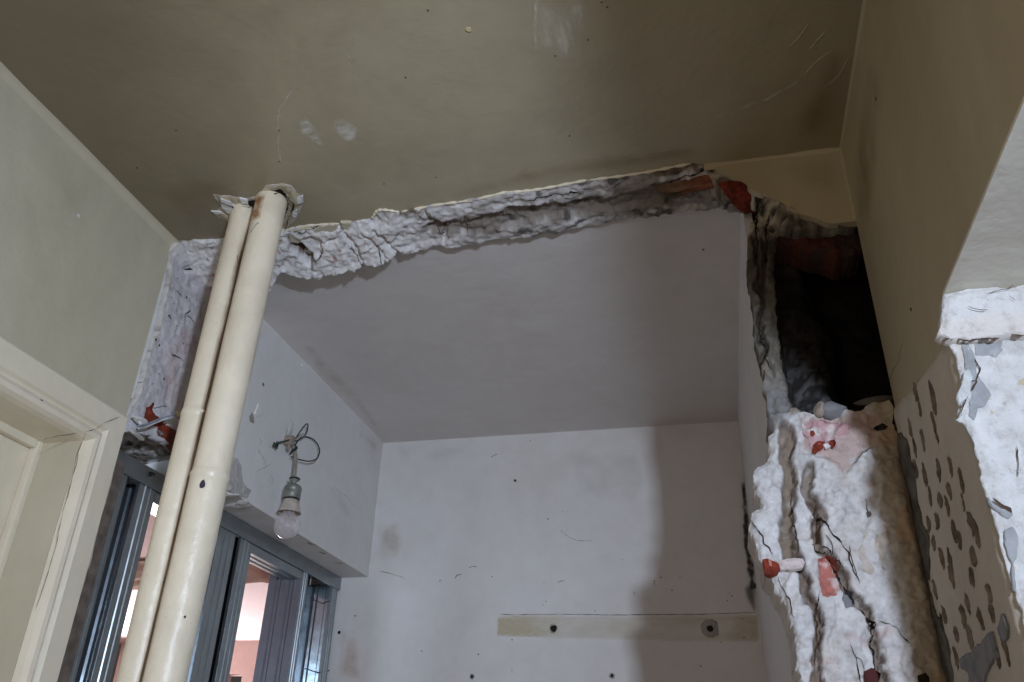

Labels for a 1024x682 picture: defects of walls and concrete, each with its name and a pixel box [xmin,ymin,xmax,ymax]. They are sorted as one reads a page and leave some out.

spalling [211,183,352,243]
spalling [707,171,862,422]
flaking render [119,242,212,464]
flaking render [802,420,851,454]
spalling [226,458,252,508]
peeling [949,340,1024,627]
flaking render [818,555,841,597]
crack [752,495,909,682]
peeling [858,530,890,574]
flaking render [863,668,881,682]